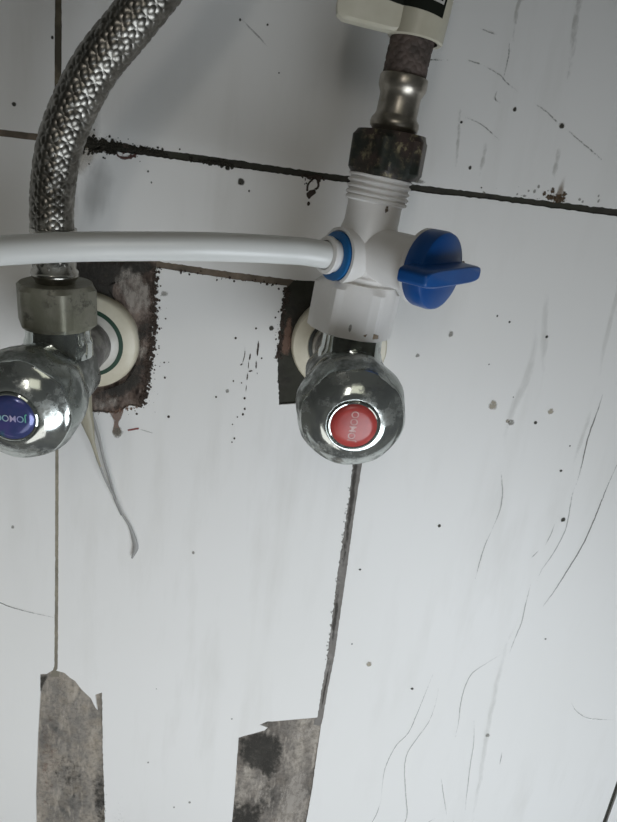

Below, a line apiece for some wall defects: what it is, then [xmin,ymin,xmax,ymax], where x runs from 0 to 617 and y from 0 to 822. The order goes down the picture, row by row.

water stain [83,129,168,165]
water stain [189,155,234,170]
water stain [301,173,325,206]
water stain [110,412,123,436]
crack [556,495,604,588]
peeling [36,671,107,822]
peeling [232,718,321,822]